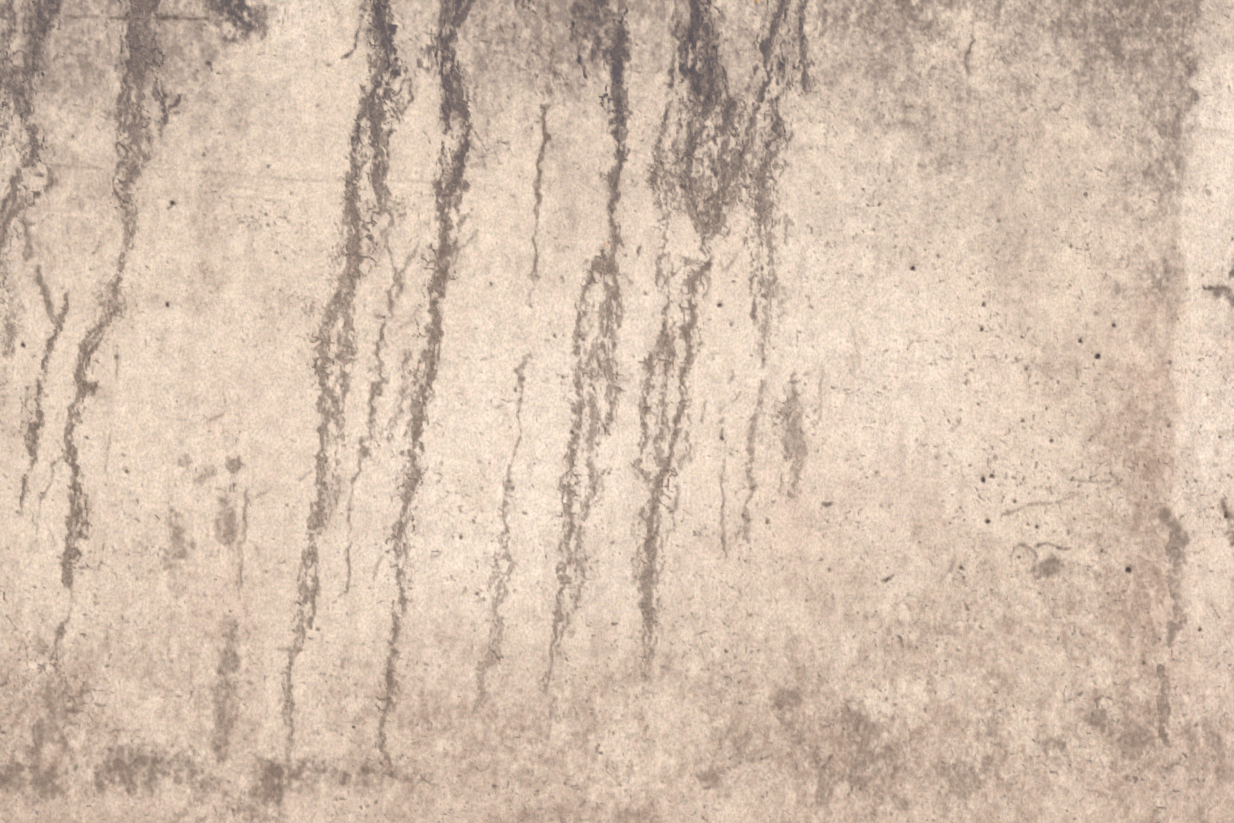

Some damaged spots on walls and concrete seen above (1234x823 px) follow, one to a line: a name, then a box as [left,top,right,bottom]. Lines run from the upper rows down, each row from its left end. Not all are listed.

water stain [0,0,61,245]
water stain [113,0,181,236]
water stain [210,0,265,41]
water stain [534,105,551,218]
water stain [20,269,68,504]
water stain [61,277,122,586]
water stain [300,0,476,776]
water stain [554,0,632,639]
water stain [632,0,817,638]
mould [1203,270,1234,301]
water stain [96,753,163,789]